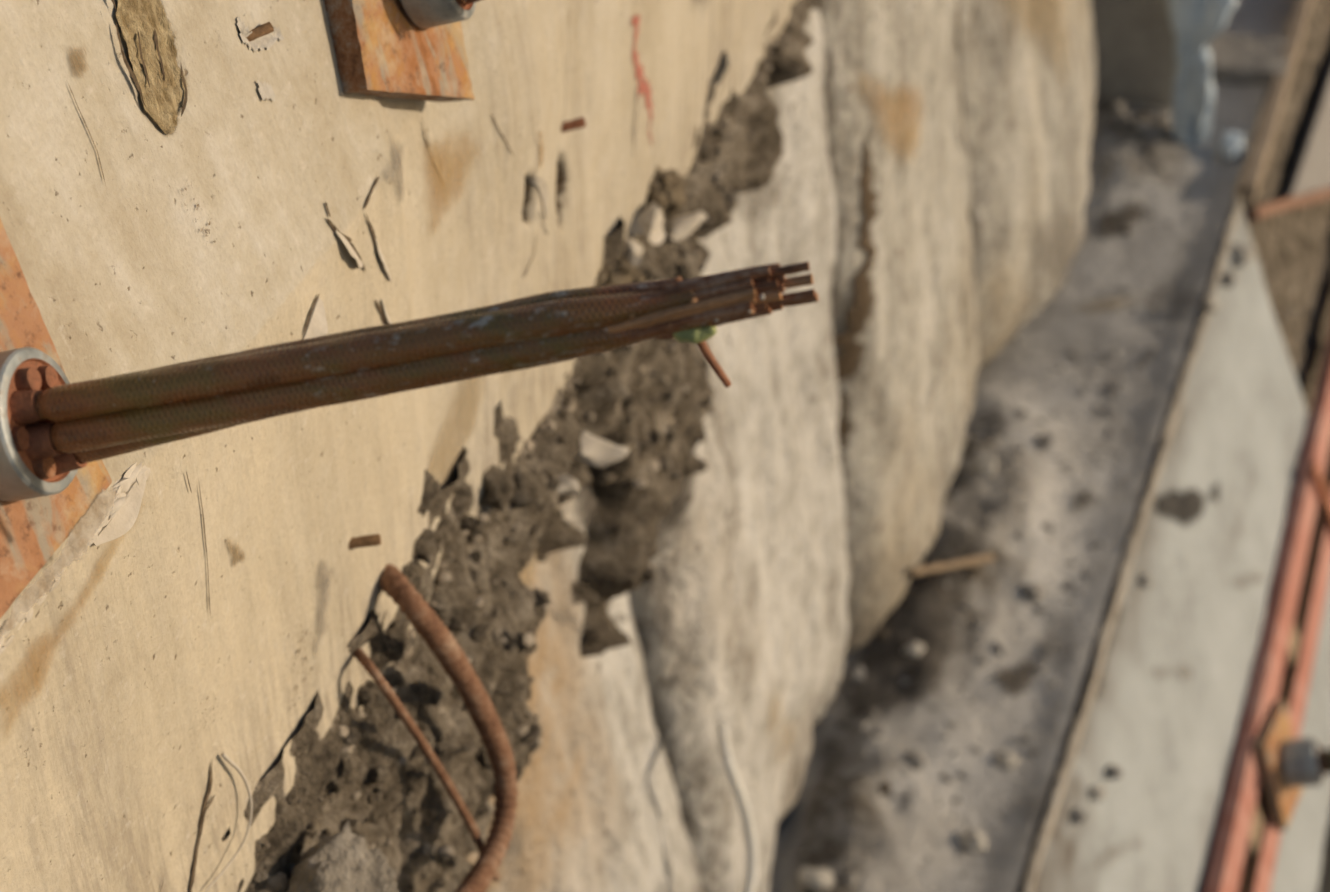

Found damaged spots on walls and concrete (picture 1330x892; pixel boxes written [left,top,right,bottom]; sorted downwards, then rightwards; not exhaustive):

spalling [111,0,187,134]
spalling [237,16,284,52]
peeling [325,177,392,281]
peeling [522,160,568,235]
peeling [303,295,328,339]
peeling [375,299,392,324]
spalling [353,564,519,892]